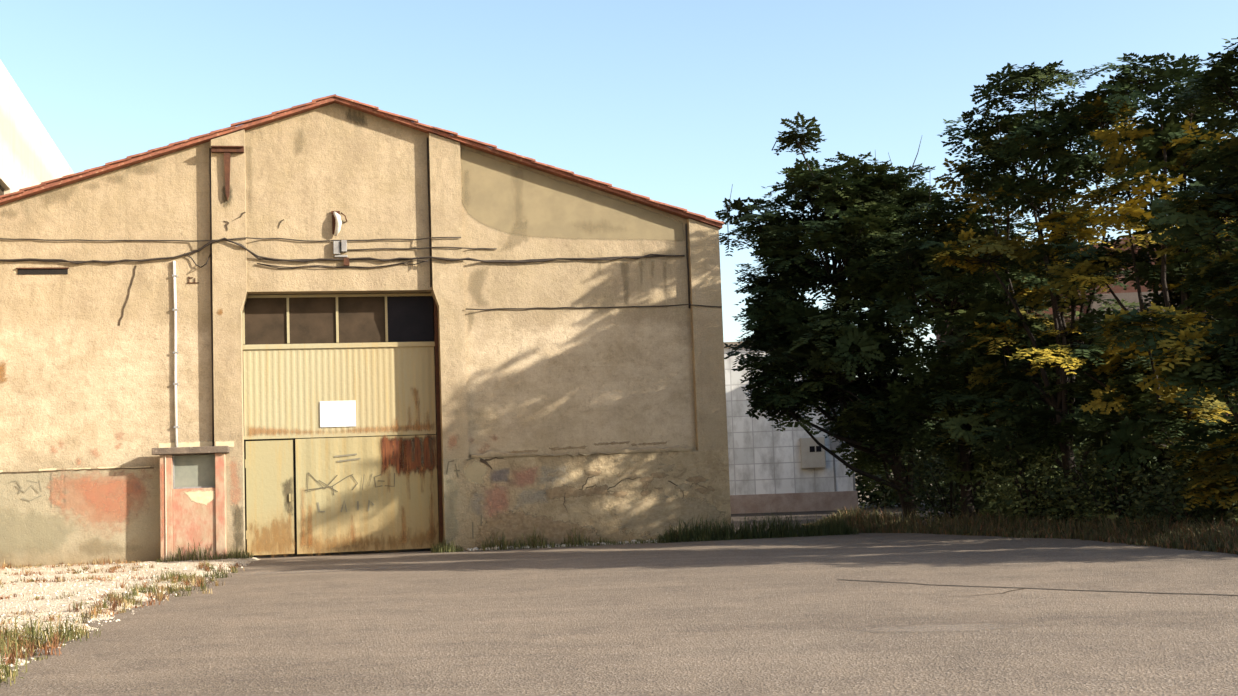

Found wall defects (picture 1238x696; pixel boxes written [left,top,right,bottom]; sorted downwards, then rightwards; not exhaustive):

rust [381,435,438,474]
crack [480,457,503,469]
peeling [39,466,151,517]
crack [544,476,706,510]